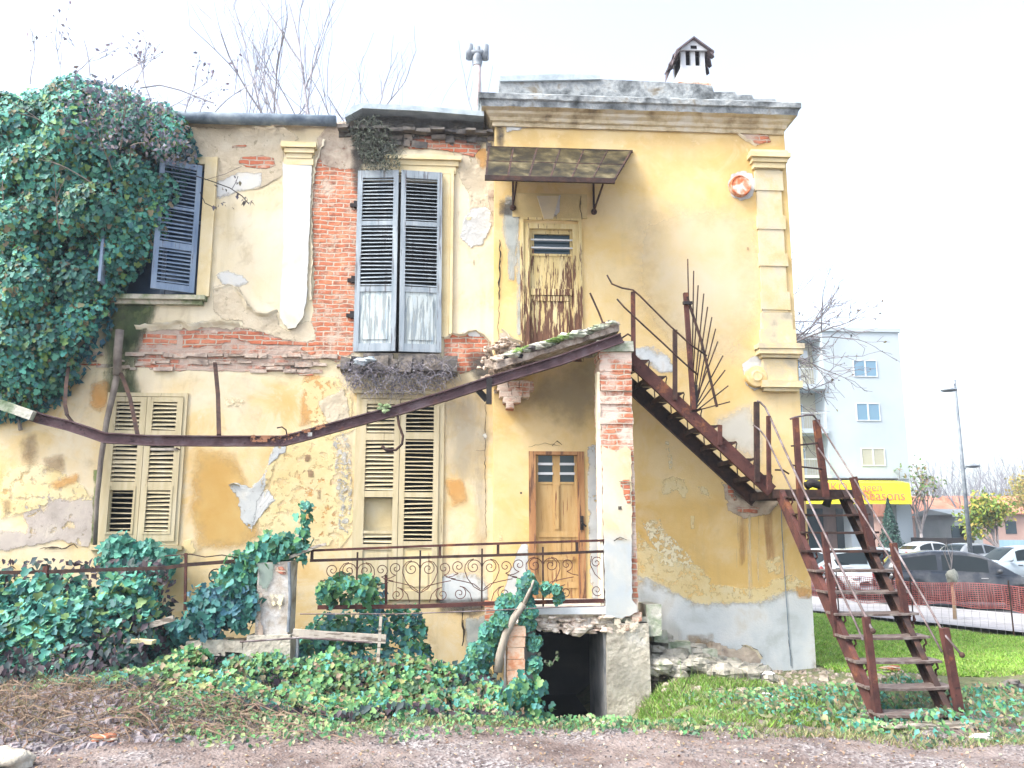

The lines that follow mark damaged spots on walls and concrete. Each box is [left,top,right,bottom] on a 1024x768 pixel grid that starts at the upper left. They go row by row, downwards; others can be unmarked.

flaking render [408,136,494,248]
spalling [733,129,771,146]
spalling [134,120,363,553]
peeling [0,464,94,551]
spalling [721,482,779,519]
flaking render [637,519,816,671]